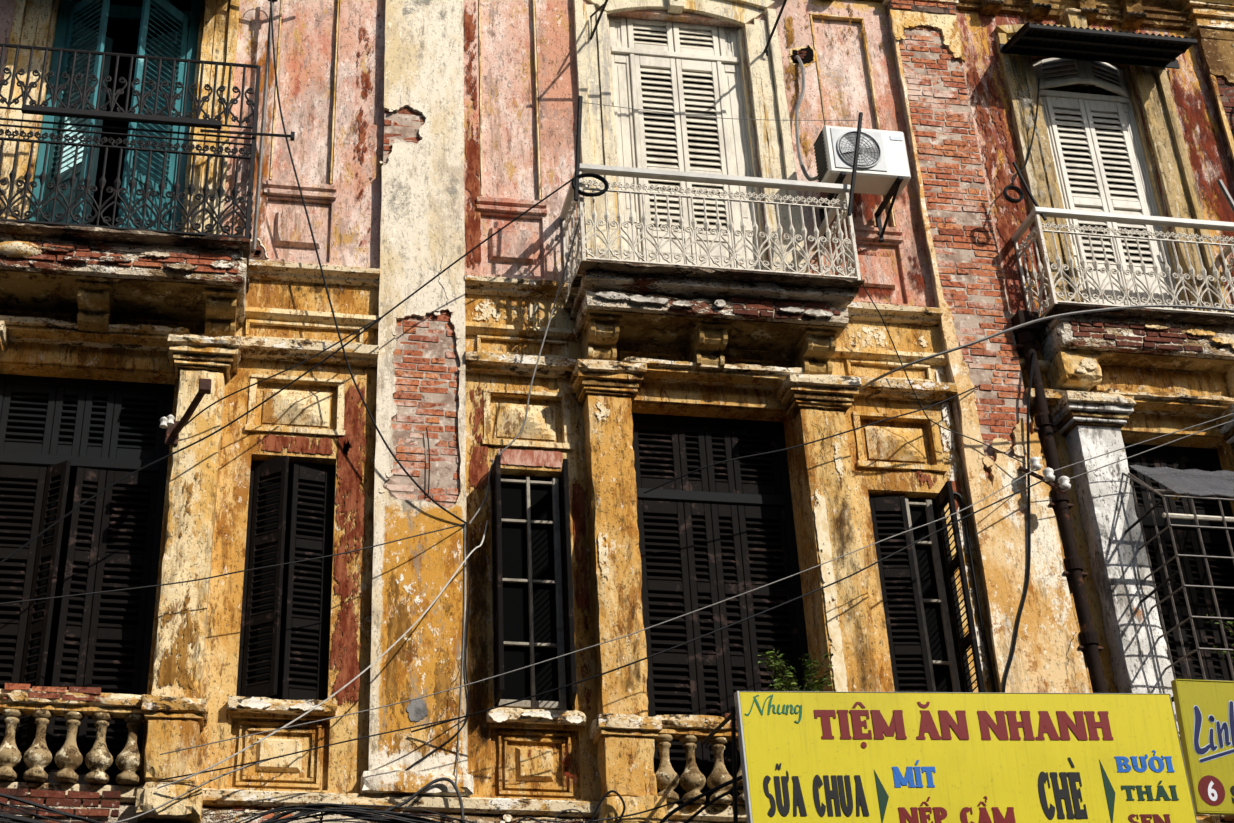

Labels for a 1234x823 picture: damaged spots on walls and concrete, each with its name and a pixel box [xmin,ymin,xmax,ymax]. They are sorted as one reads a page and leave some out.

flaking render [788,45,816,67]
peeling [354,15,428,208]
peeling [1168,69,1234,303]
flaking render [13,238,270,274]
flaking render [798,0,1036,477]
peeling [595,291,694,307]
flaking render [714,297,887,346]
flaking render [1070,320,1234,352]
flaking render [258,306,569,714]
peeling [489,480,609,724]
flaking render [3,683,105,702]
peeling [238,697,271,710]